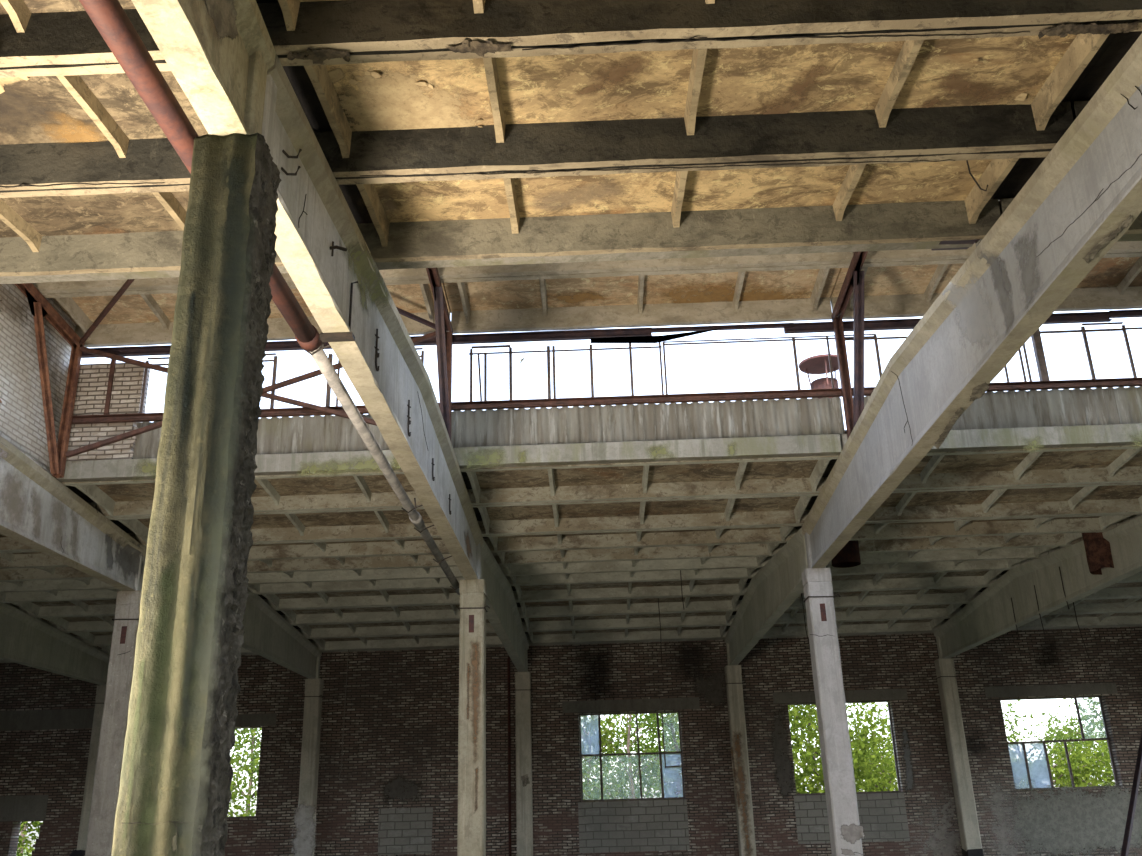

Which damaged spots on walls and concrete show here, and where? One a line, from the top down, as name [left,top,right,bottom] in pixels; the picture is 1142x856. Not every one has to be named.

peeling [0,77,29,94]
spalling [446,40,513,57]
crack [1037,154,1142,257]
spalling [1083,215,1134,264]
leakage [157,158,252,856]
rust [467,643,480,811]
rust [731,733,752,856]
peeling [841,824,865,856]